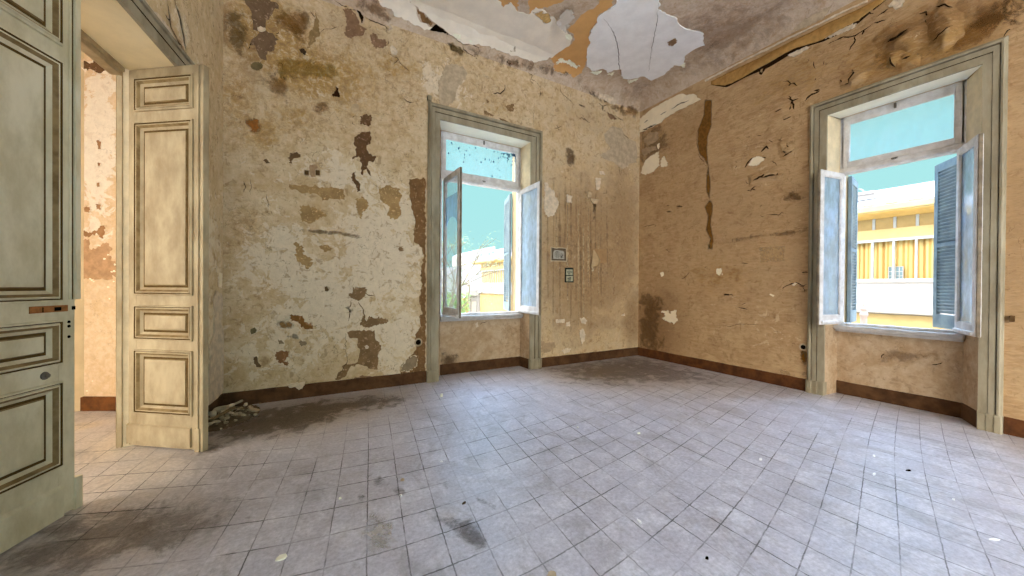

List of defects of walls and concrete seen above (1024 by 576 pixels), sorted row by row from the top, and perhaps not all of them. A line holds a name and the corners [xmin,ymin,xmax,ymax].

flaking render [241,0,282,73]
peeling [378,0,705,84]
crack [827,6,889,51]
peeling [639,94,701,175]
leakage [698,100,713,249]
flaking render [286,112,427,381]
peeling [661,310,678,324]